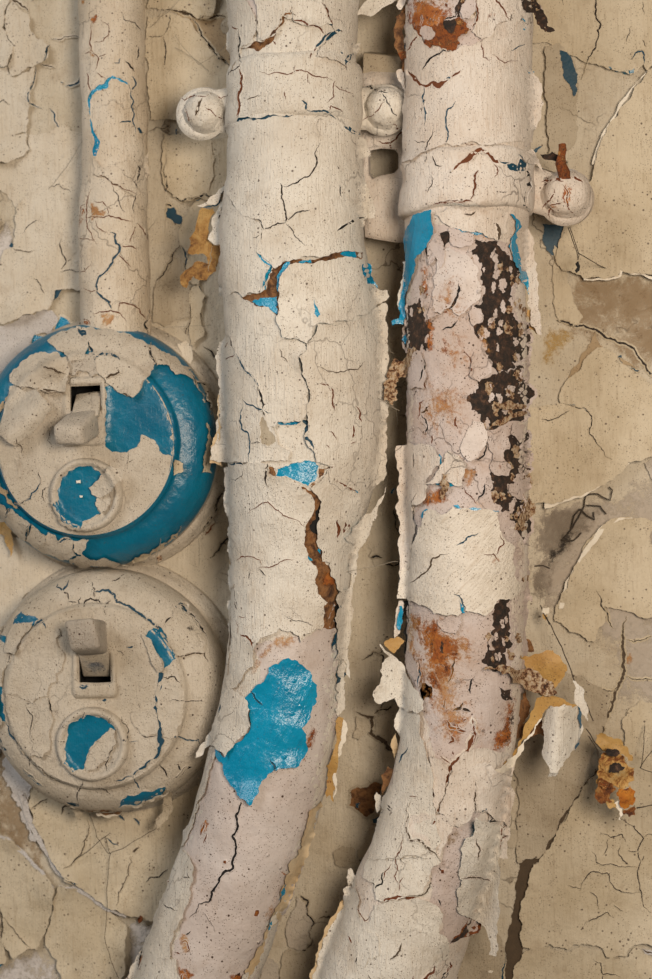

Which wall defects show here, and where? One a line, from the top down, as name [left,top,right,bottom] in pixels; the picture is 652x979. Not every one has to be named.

rust [407,0,476,51]
rust [521,0,555,32]
crack [581,0,646,80]
crack [0,0,583,364]
peeling [145,0,652,362]
peeling [0,326,213,456]
rust [402,227,538,546]
peeling [153,115,652,979]
rust [394,599,524,737]
peeling [0,628,338,979]
crack [501,770,598,979]
crack [568,817,652,925]